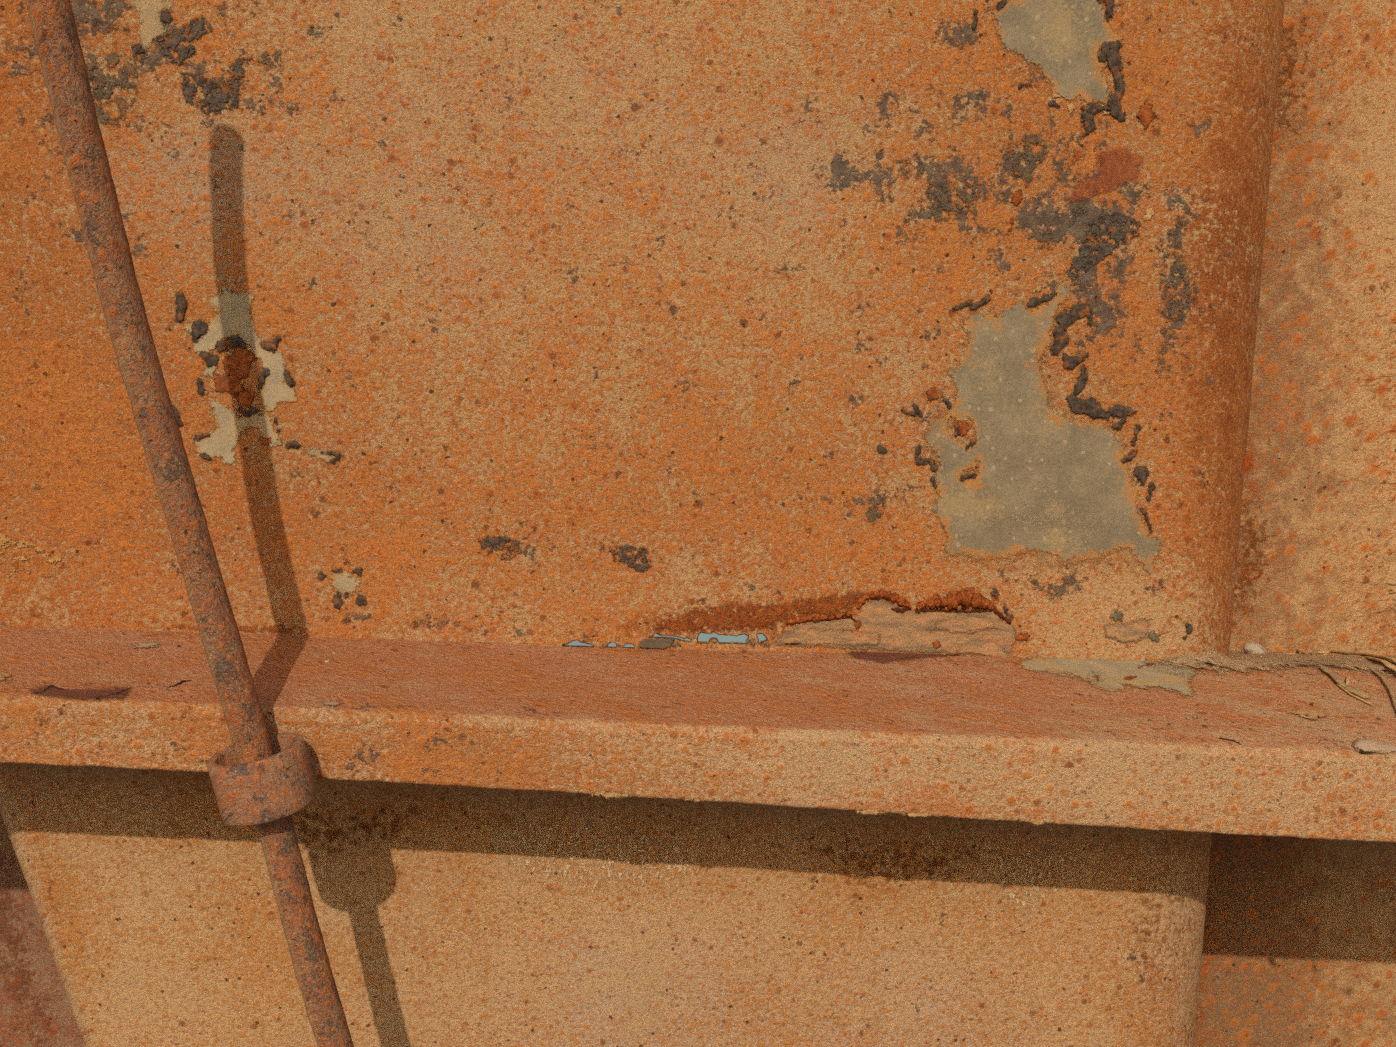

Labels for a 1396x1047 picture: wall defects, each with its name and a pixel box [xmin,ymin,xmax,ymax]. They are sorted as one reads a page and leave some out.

peeling [130,0,173,54]
peeling [971,0,1156,137]
rust [1274,13,1312,137]
peeling [172,287,342,472]
peeling [901,265,1166,574]
peeling [317,567,367,609]
rust [652,592,865,634]
spalling [745,587,1198,696]
rust [1232,510,1275,624]